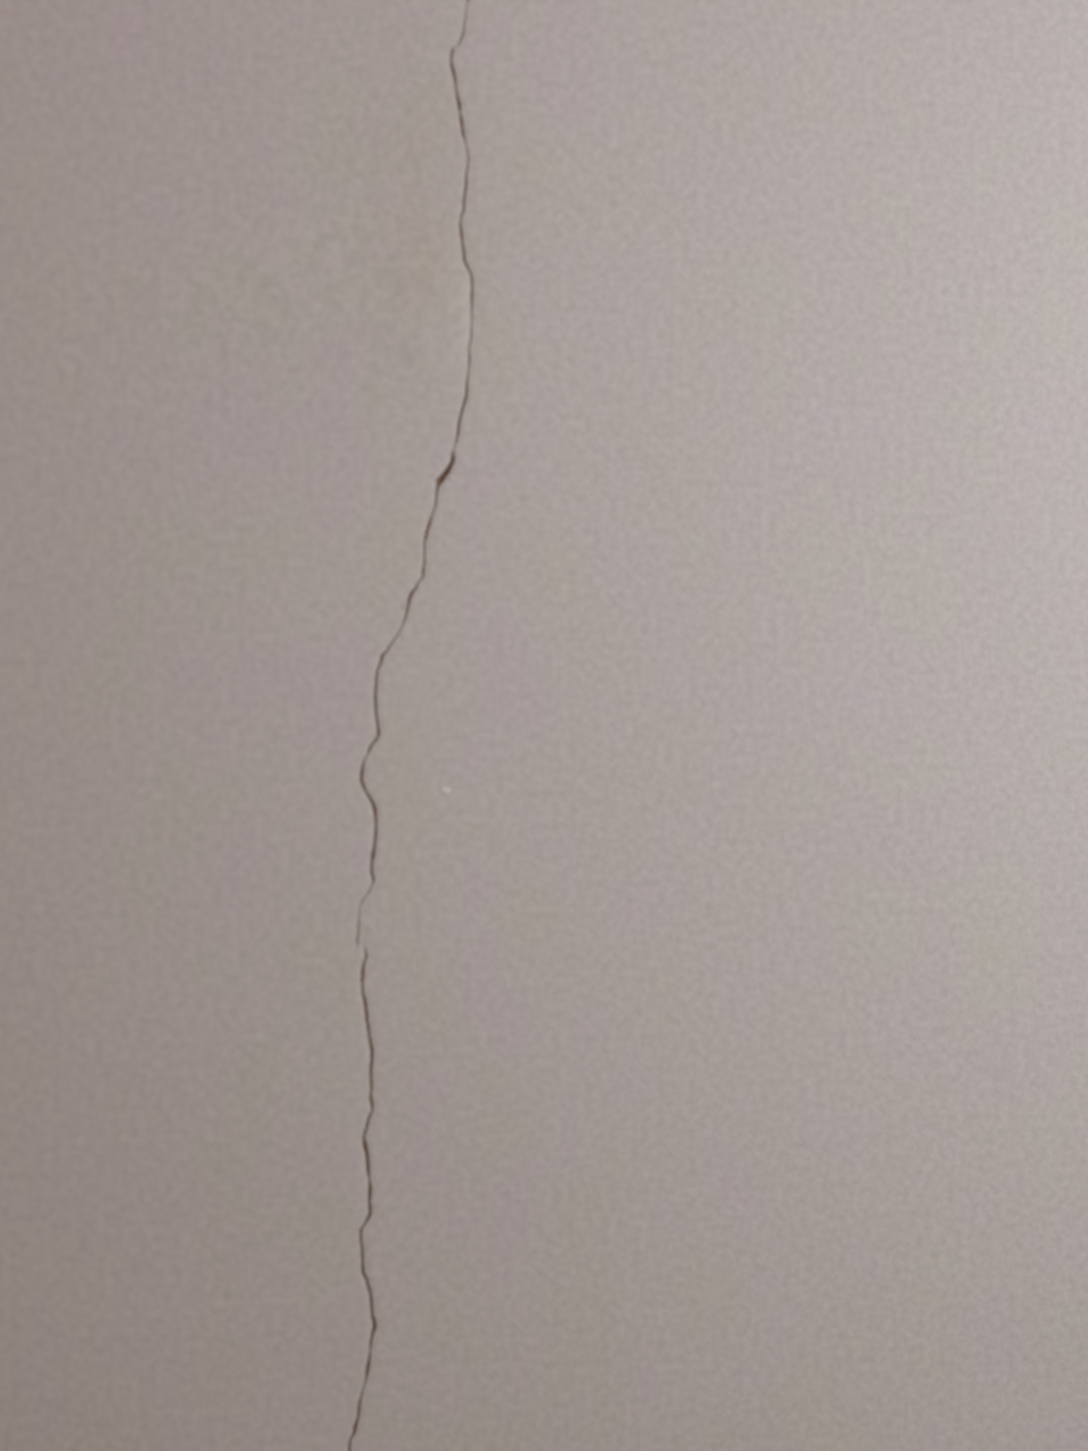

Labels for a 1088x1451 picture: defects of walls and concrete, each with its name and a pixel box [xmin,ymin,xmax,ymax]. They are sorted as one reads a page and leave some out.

crack [349,0,473,1451]